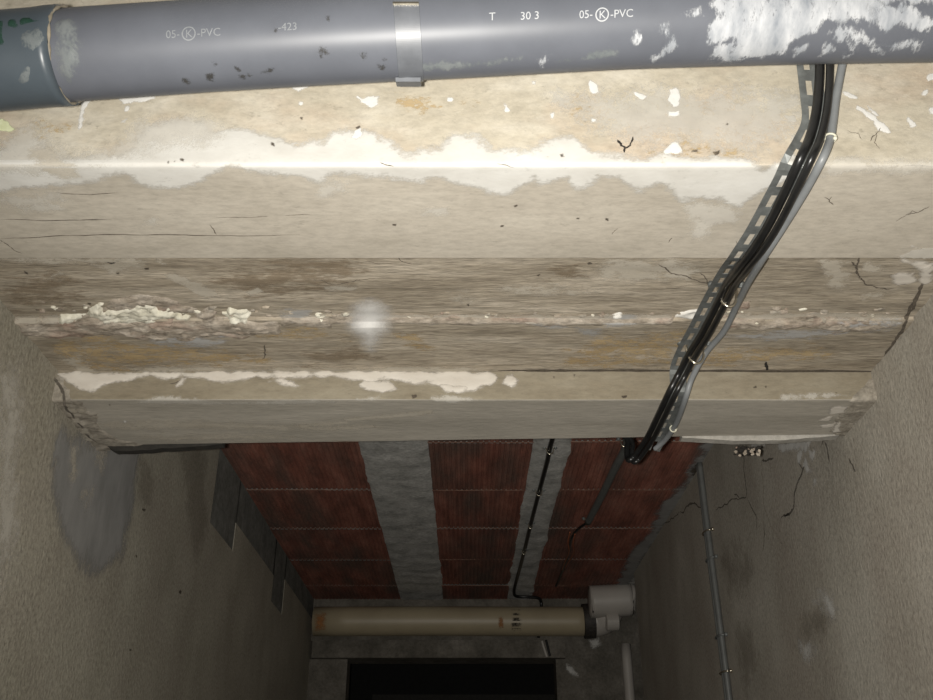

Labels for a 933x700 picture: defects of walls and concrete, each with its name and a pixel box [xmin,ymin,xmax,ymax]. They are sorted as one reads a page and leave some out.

crack [851,258,892,290]
water stain [15,304,191,325]
water stain [225,307,251,325]
crack [498,272,931,372]
peeling [360,380,396,392]
peeling [440,384,468,393]
peeling [503,375,518,387]
crack [54,378,97,443]
peeling [819,406,847,433]
crack [665,463,804,547]